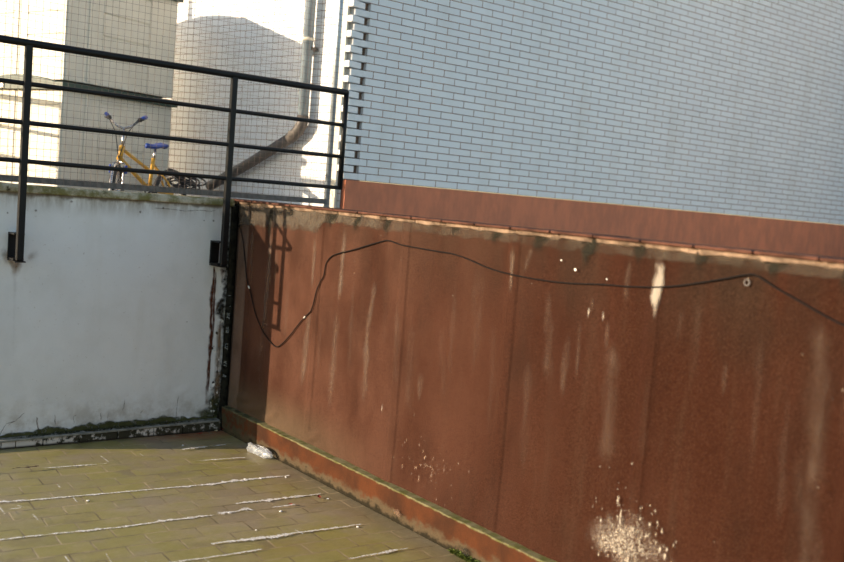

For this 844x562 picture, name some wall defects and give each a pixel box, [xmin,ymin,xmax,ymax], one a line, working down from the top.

corrosion [206,268,224,390]
water stain [651,266,663,307]